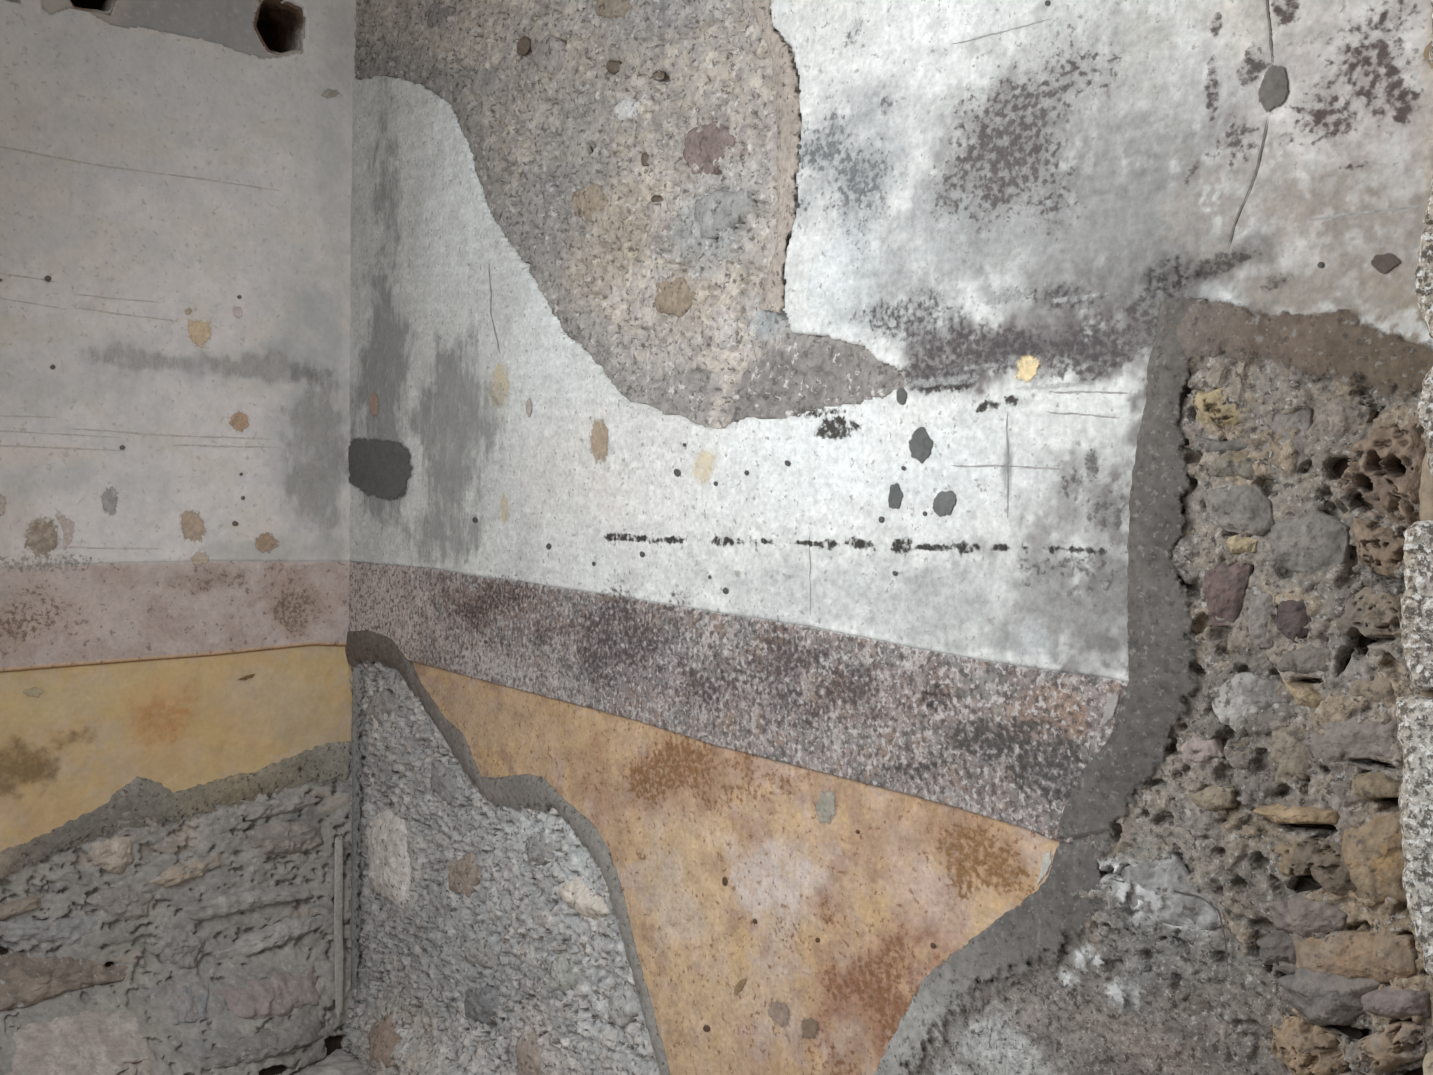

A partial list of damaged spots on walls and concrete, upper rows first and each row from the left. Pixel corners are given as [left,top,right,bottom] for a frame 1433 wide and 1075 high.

spalling [42,0,282,59]
spalling [354,0,904,429]
damp [796,113,893,259]
damp [933,24,1121,231]
crack [1227,116,1268,248]
crack [1265,0,1273,61]
damp [1271,0,1298,24]
damp [1279,0,1423,150]
damp [863,267,1182,412]
damp [796,409,859,439]
spalling [874,297,1433,1075]
spalling [0,630,670,1075]